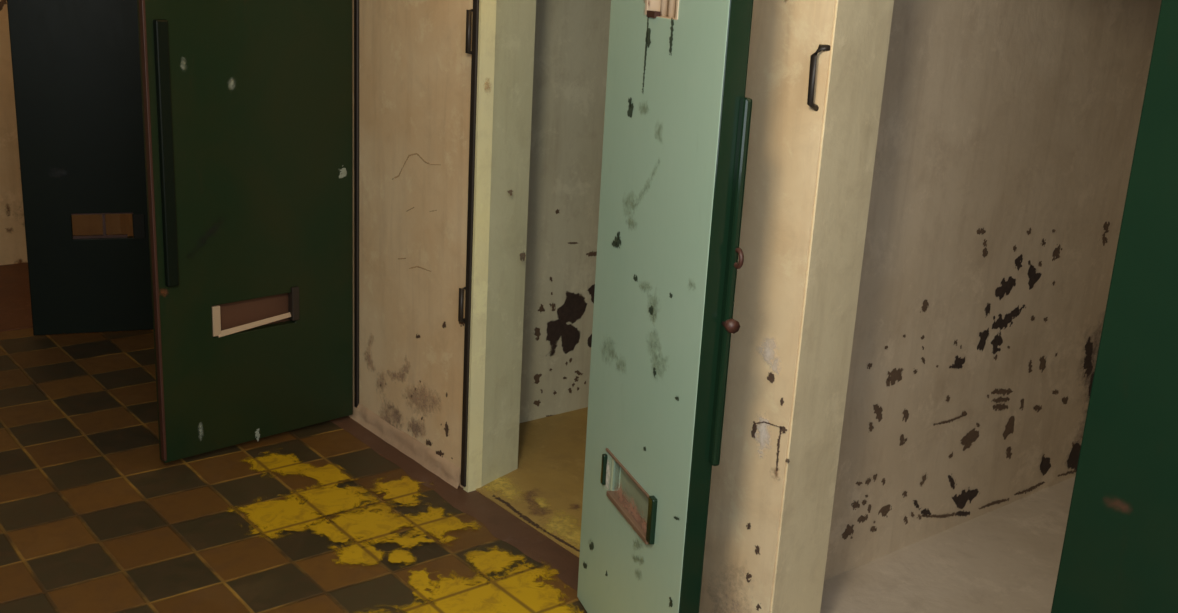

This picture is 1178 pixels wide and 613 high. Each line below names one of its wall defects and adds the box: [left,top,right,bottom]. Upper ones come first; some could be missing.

peeling [977,228,1063,360]
peeling [534,277,595,406]
spalling [886,335,965,386]
damp [1083,332,1101,398]
peeling [227,429,583,613]
spalling [842,474,892,540]
spalling [869,404,883,432]
damp [948,475,979,517]
spalling [949,411,980,459]
spalling [987,388,1042,459]
damp [1040,454,1051,476]
damp [1067,436,1082,470]